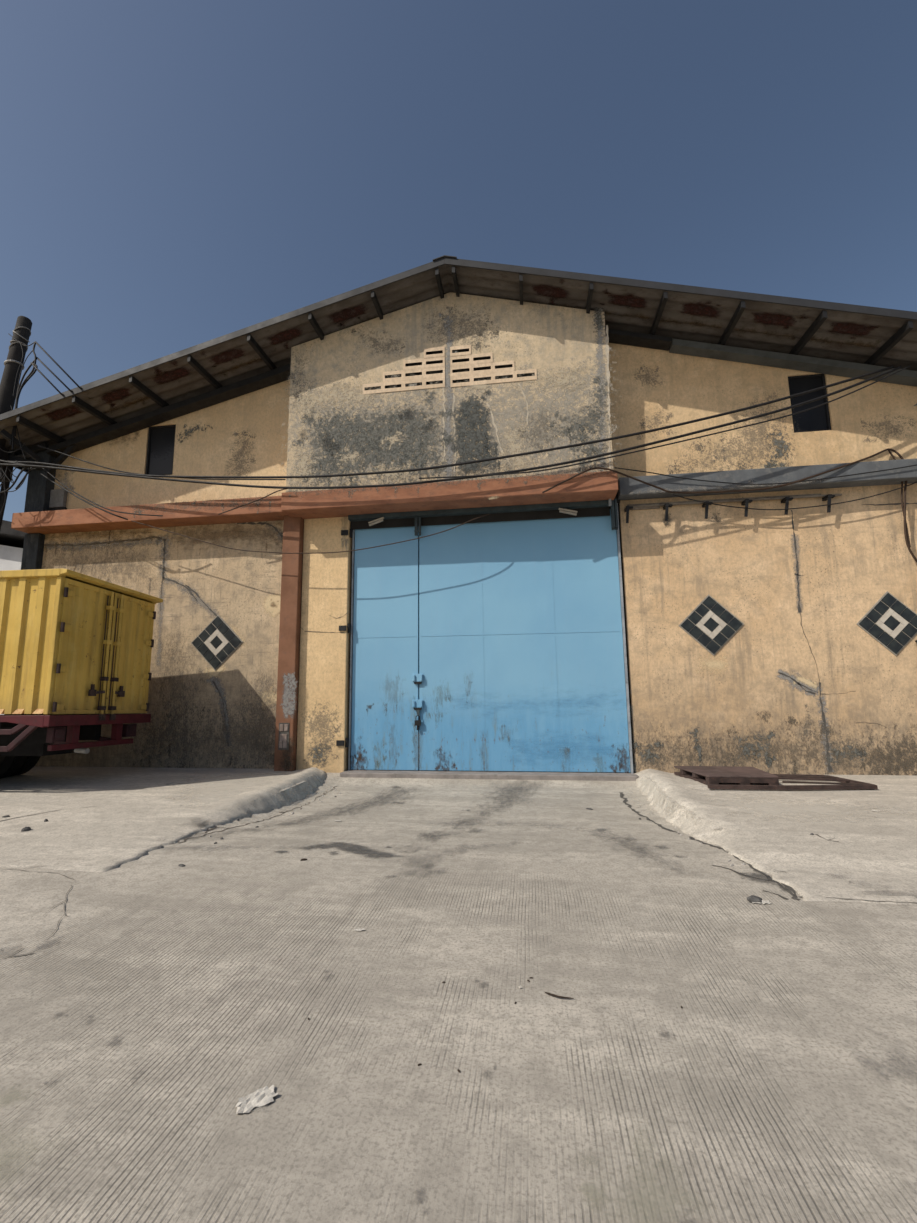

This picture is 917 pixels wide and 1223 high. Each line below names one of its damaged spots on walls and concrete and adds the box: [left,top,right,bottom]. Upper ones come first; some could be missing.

corrosion [533,279,571,308]
corrosion [600,290,646,319]
corrosion [661,302,719,328]
corrosion [738,313,807,339]
corrosion [811,323,878,347]
leakage [294,390,500,486]
leakage [550,376,609,473]
crack [778,510,848,773]
leakage [133,651,331,806]
leakage [630,714,917,816]